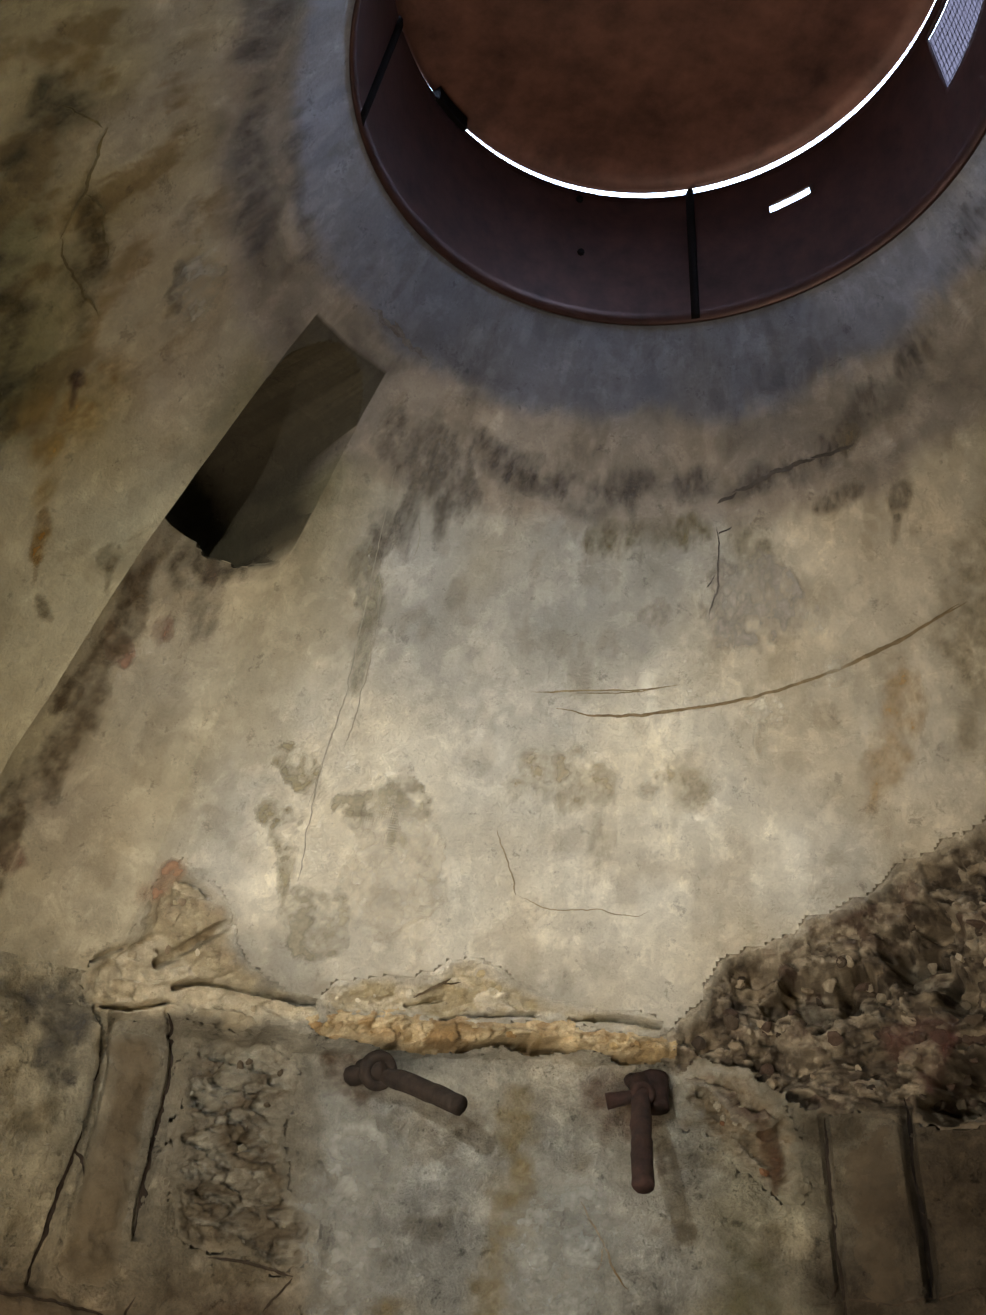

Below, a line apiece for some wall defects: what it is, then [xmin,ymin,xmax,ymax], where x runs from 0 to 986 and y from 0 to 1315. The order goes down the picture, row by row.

leakage [30,511,50,563]
leakage [170,548,266,582]
leakage [354,416,477,616]
crack [707,443,854,620]
leakage [0,559,154,867]
spalling [80,819,986,1276]
leakage [305,1113,387,1315]
leakage [507,1197,599,1315]